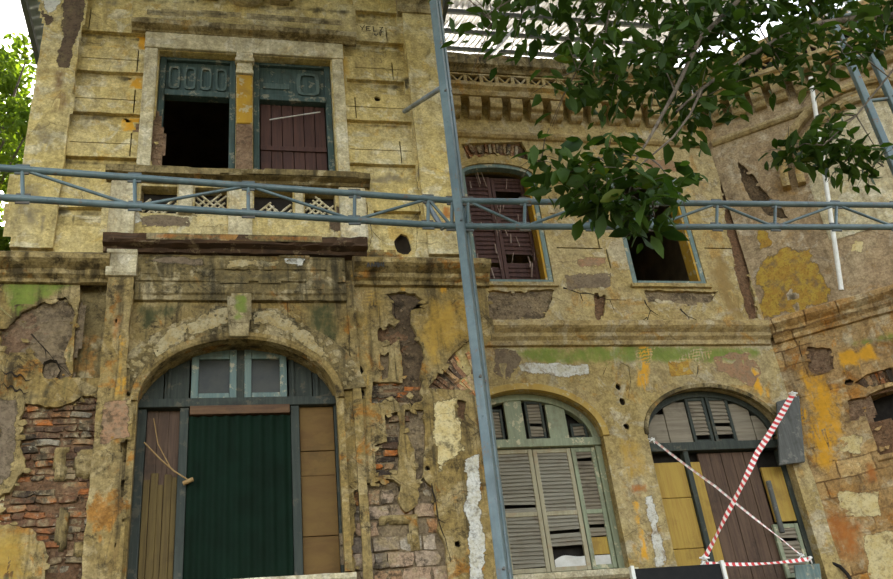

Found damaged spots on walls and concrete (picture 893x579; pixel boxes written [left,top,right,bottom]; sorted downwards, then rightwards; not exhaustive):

flaking render [38,0,88,69]
flaking render [738,164,787,218]
peeling [563,255,613,320]
peeling [719,178,835,320]
flaking render [0,299,93,380]
flaking render [477,288,593,382]
flaking render [805,347,834,375]
flaking render [339,287,490,579]
flaking render [837,368,893,458]
flaking render [0,396,134,579]